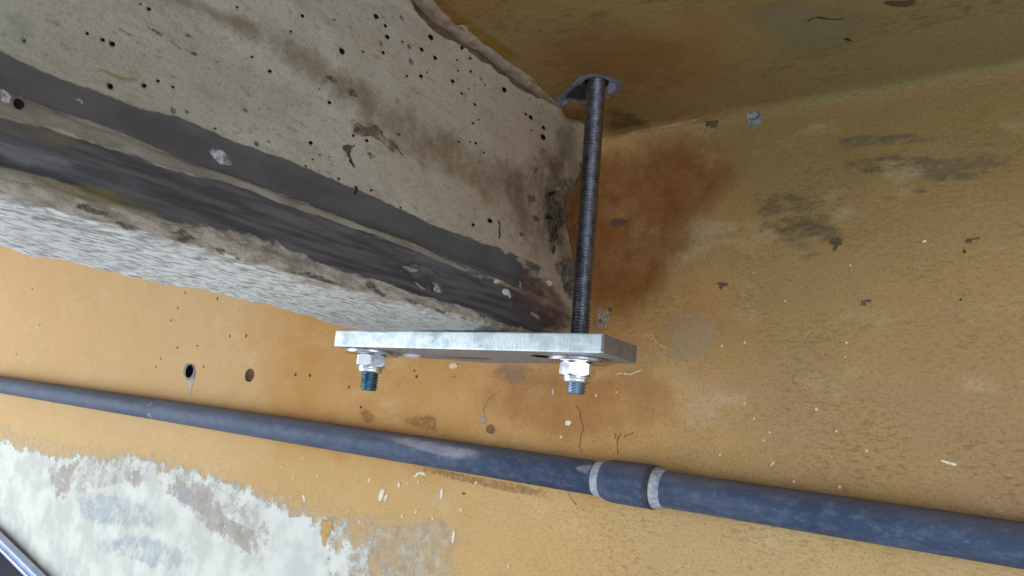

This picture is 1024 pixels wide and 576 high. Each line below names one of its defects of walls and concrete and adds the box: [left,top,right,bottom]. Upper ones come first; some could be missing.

damp [544,191,563,254]
peeling [0,435,455,576]